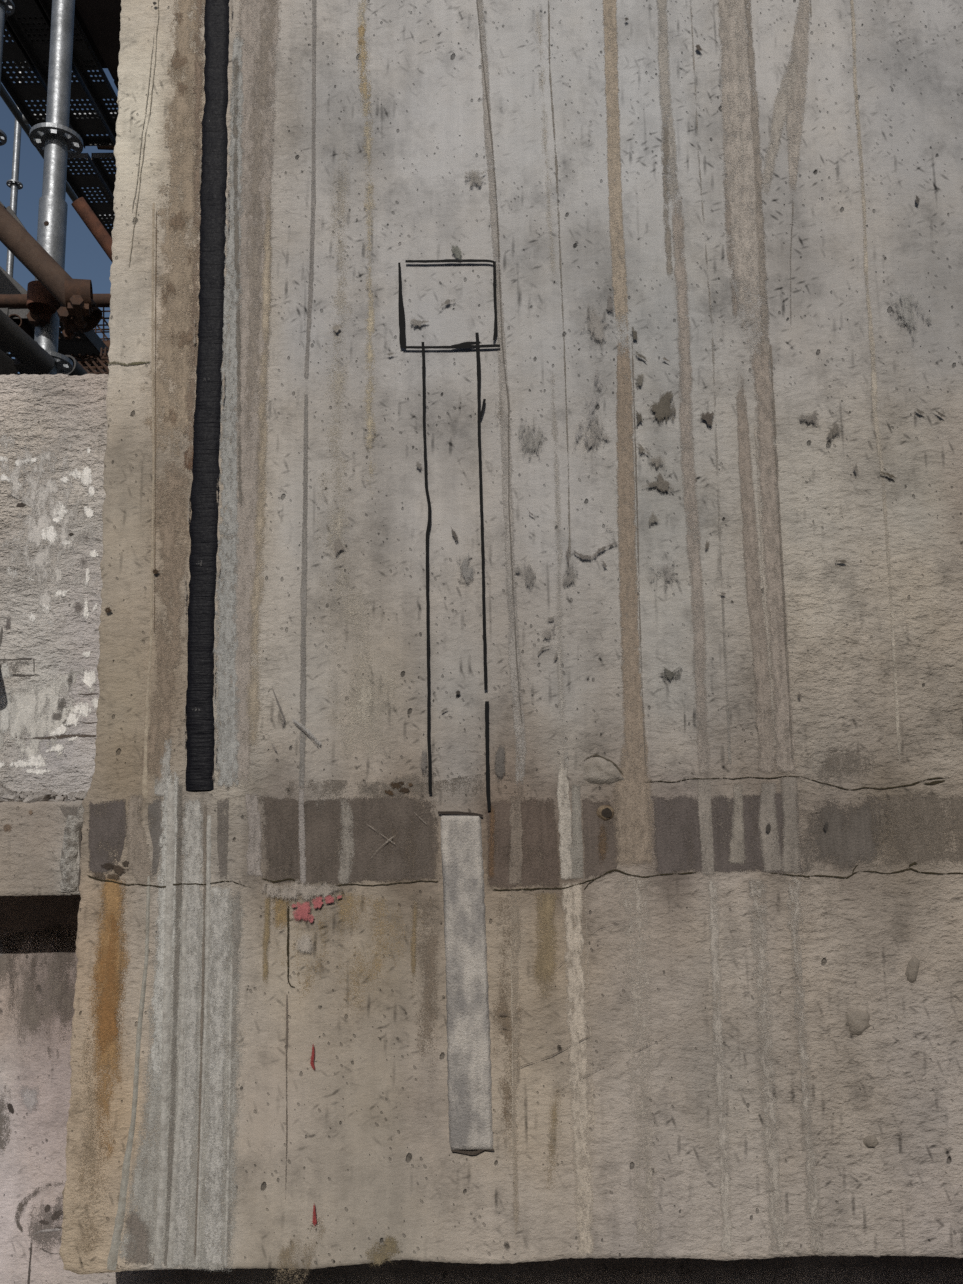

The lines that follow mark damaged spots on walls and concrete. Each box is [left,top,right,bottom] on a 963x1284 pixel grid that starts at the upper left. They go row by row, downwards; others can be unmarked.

crack [438,810,483,818]
crack [492,869,697,891]
crack [777,862,963,879]
leakage [0,926,77,1059]
corrosion [70,876,130,1255]
leakage [0,1085,39,1154]